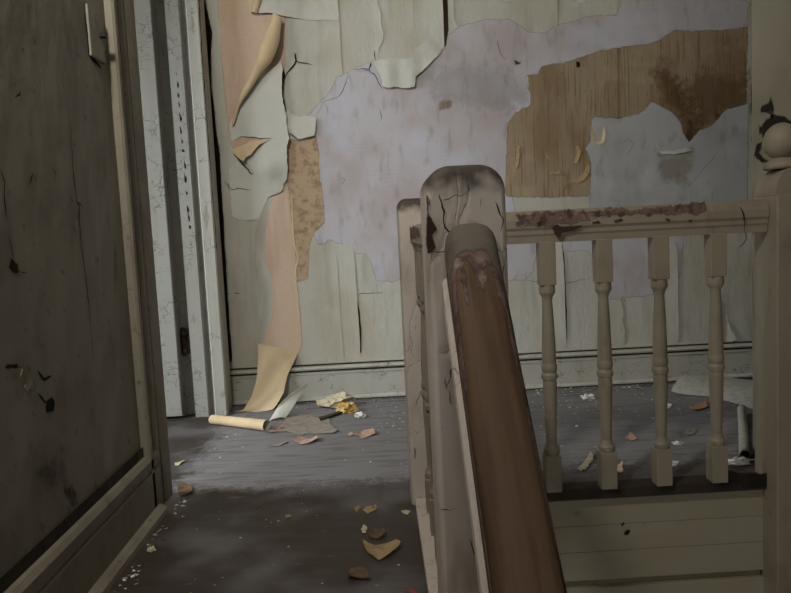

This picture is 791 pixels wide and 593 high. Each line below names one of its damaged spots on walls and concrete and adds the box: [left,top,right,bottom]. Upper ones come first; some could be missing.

crack [317,0,384,115]
crack [449,0,457,28]
water stain [505,27,748,198]
peeling [286,0,791,341]
spalling [5,364,55,413]
peeling [209,343,310,431]